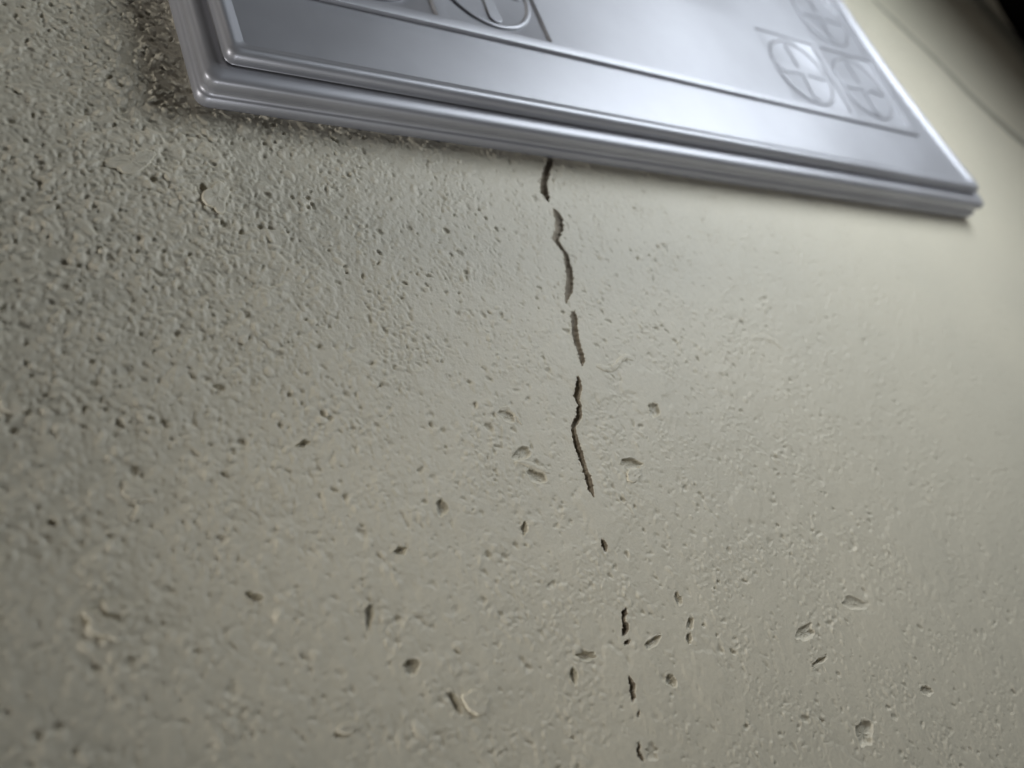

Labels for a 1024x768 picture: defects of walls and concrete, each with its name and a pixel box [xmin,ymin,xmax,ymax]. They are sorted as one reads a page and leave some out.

crack [538,157,596,498]
crack [600,538,609,552]
crack [620,608,632,646]
crack [627,675,642,716]
crack [635,743,645,762]